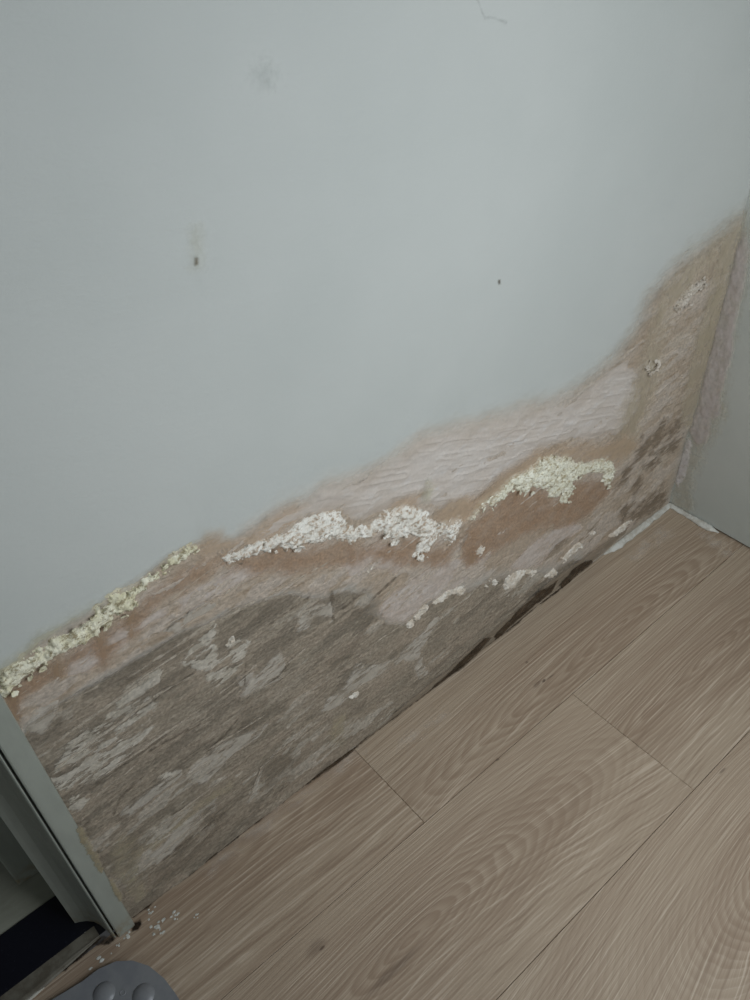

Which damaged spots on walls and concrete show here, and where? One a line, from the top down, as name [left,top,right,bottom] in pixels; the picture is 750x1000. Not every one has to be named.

flaking render [0,217,743,919]
water stain [0,228,747,785]